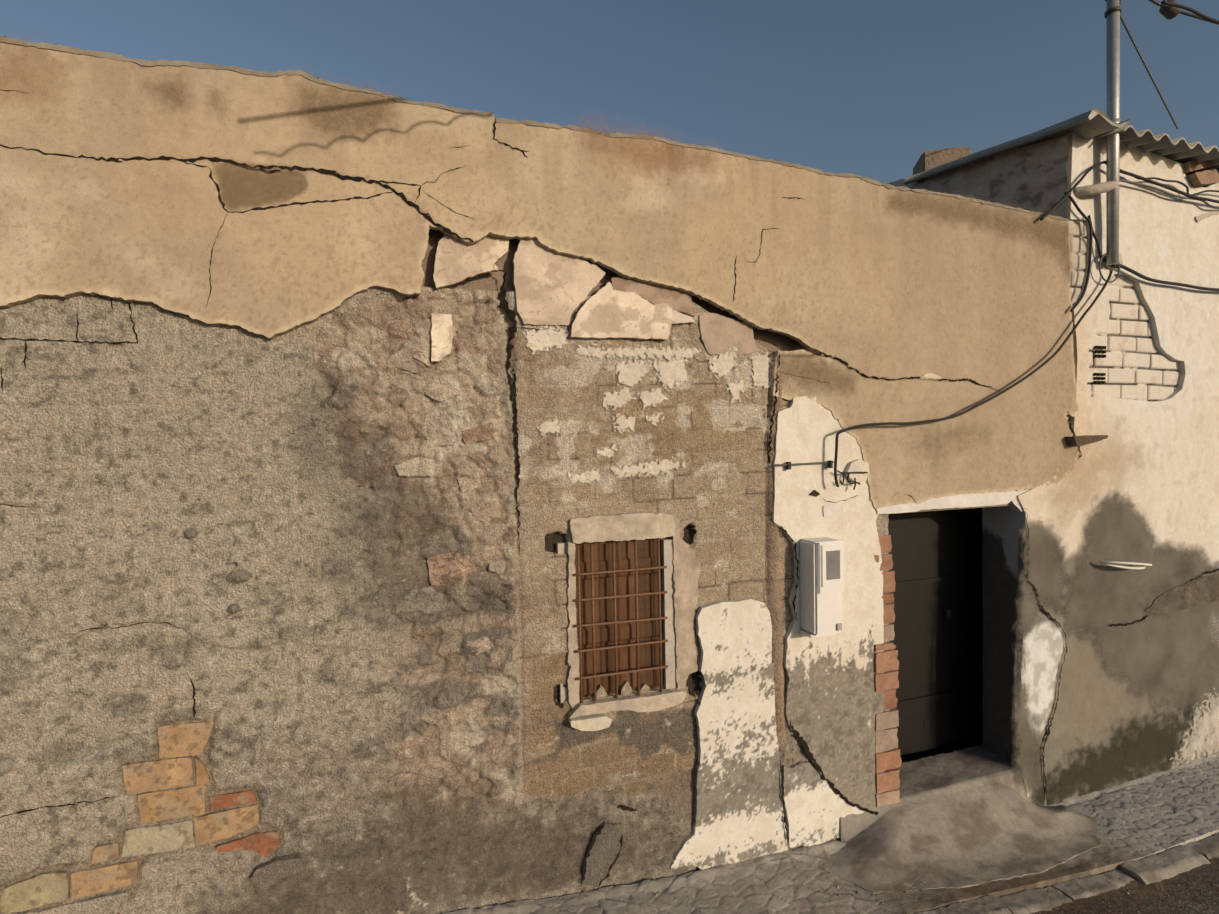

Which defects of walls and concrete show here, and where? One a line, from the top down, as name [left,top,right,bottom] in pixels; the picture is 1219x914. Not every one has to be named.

crack [0,119,529,307]
crack [733,228,779,302]
flaking render [1068,220,1088,307]
crack [0,298,138,390]
flaking render [1087,275,1180,402]
crack [498,270,606,554]
crack [74,622,183,635]
crack [189,679,197,717]
flaking render [0,239,1030,914]
water stain [1014,494,1219,799]